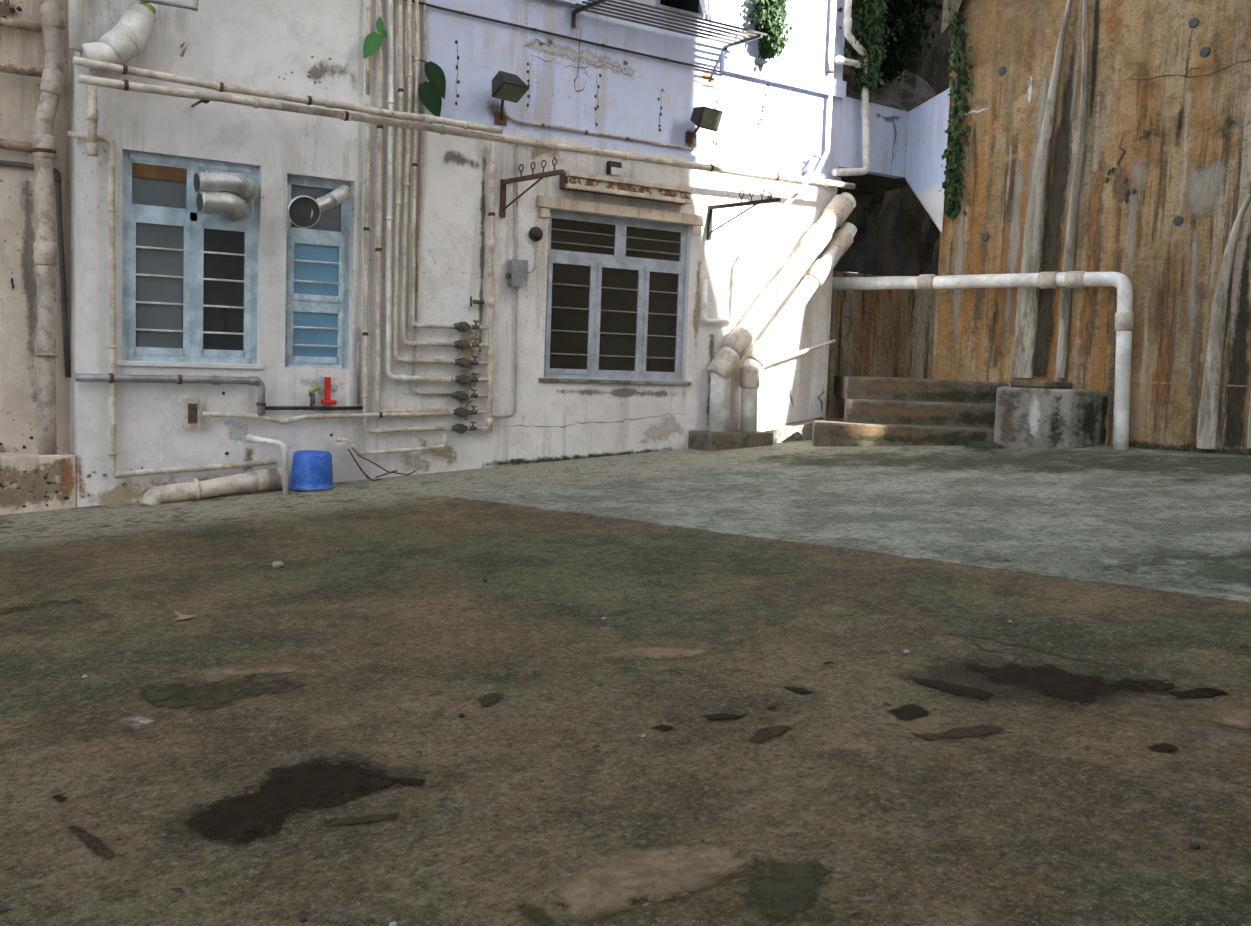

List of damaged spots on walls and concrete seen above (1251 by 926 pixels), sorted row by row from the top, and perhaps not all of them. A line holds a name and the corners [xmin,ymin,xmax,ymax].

peeling [523,38,641,79]
spalling [0,460,70,509]